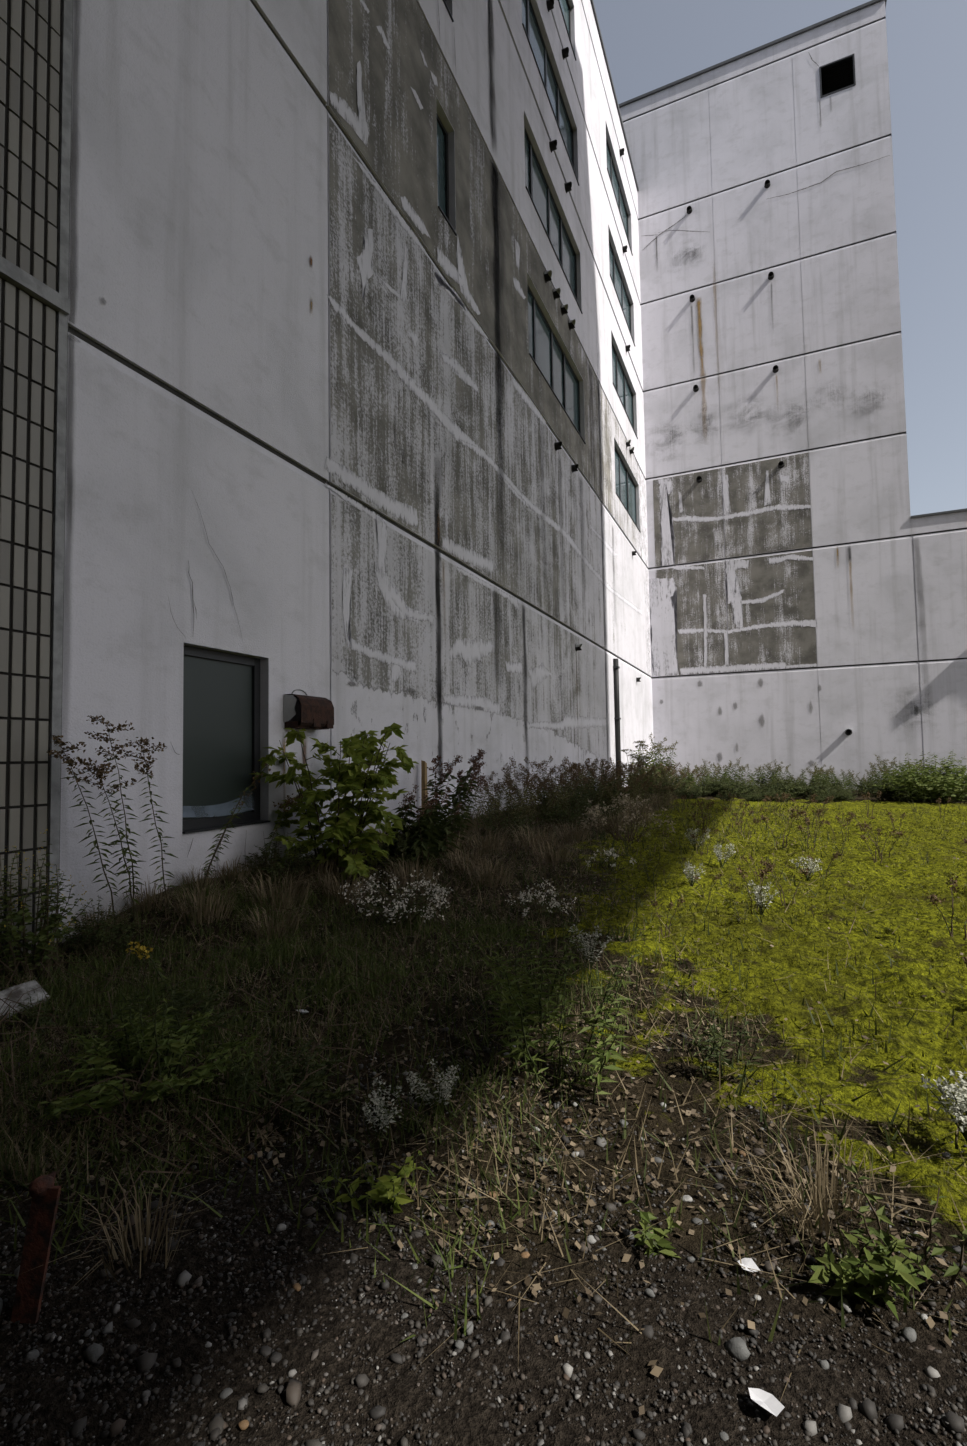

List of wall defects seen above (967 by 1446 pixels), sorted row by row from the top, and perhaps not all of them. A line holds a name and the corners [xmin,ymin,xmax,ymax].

water stain [492,163,502,427]
corrosion [697,300,706,410]
crack [168,492,243,641]
water stain [435,499,444,777]
water stain [590,369,604,582]